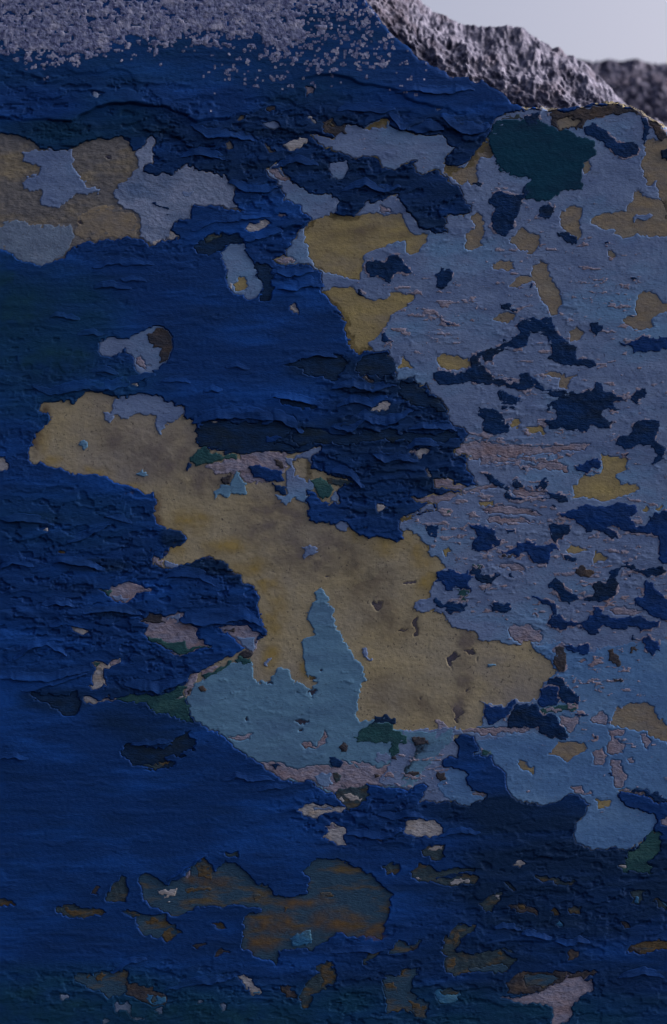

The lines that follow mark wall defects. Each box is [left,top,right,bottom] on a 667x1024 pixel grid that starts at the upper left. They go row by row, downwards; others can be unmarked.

peeling [0,0,475,96]
peeling [0,101,667,875]
peeling [494,921,590,947]
flaking render [501,970,597,1024]